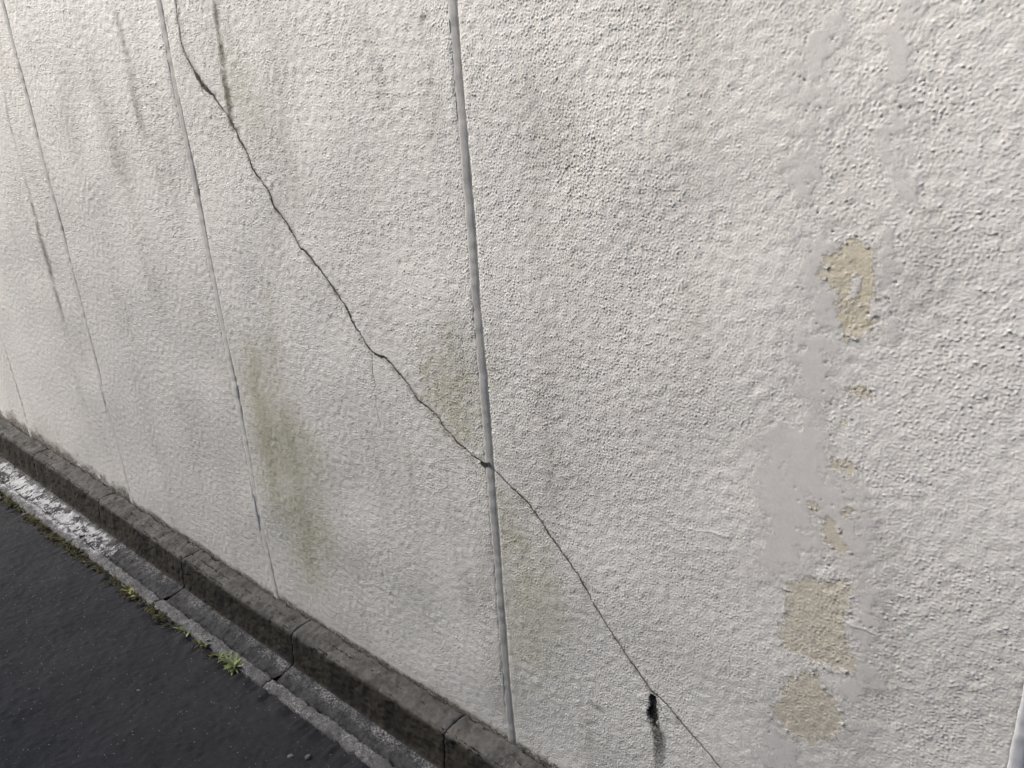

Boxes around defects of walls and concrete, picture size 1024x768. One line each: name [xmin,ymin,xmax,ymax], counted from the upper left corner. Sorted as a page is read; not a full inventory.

peeling [816,230,893,341]
crack [176,3,718,765]
damp [0,413,556,768]
damp [648,705,664,765]
peeling [768,575,856,747]